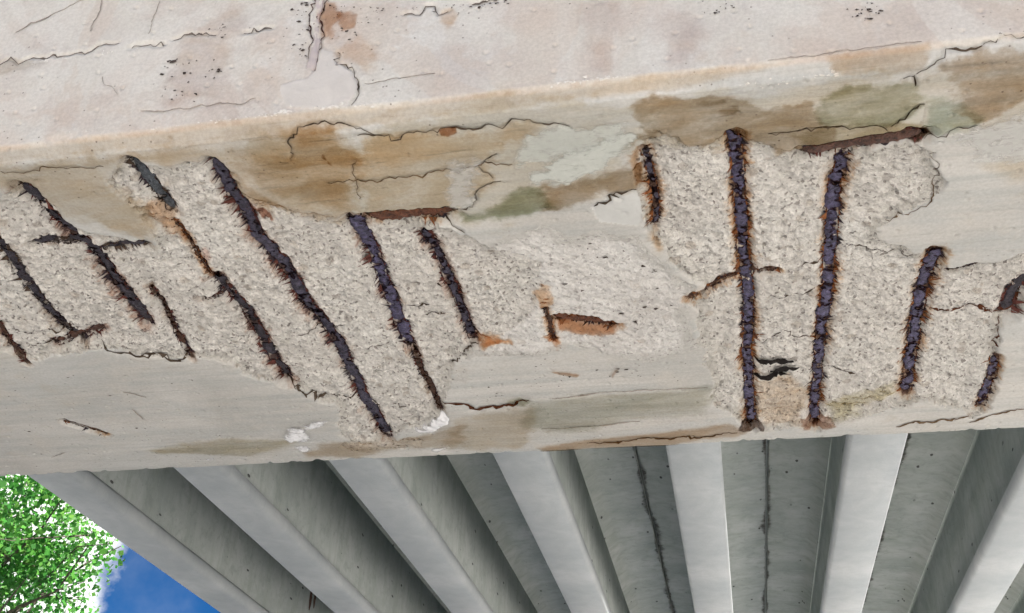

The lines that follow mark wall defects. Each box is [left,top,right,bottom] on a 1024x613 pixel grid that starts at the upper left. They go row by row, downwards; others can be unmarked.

crack [15,0,102,33]
crack [149,98,254,112]
crack [330,154,512,233]
crack [287,0,570,159]
damp [449,164,478,208]
damp [518,124,637,186]
crack [768,33,1024,136]
damp [959,115,1024,163]
spalling [0,156,623,453]
spalling [590,106,1024,431]